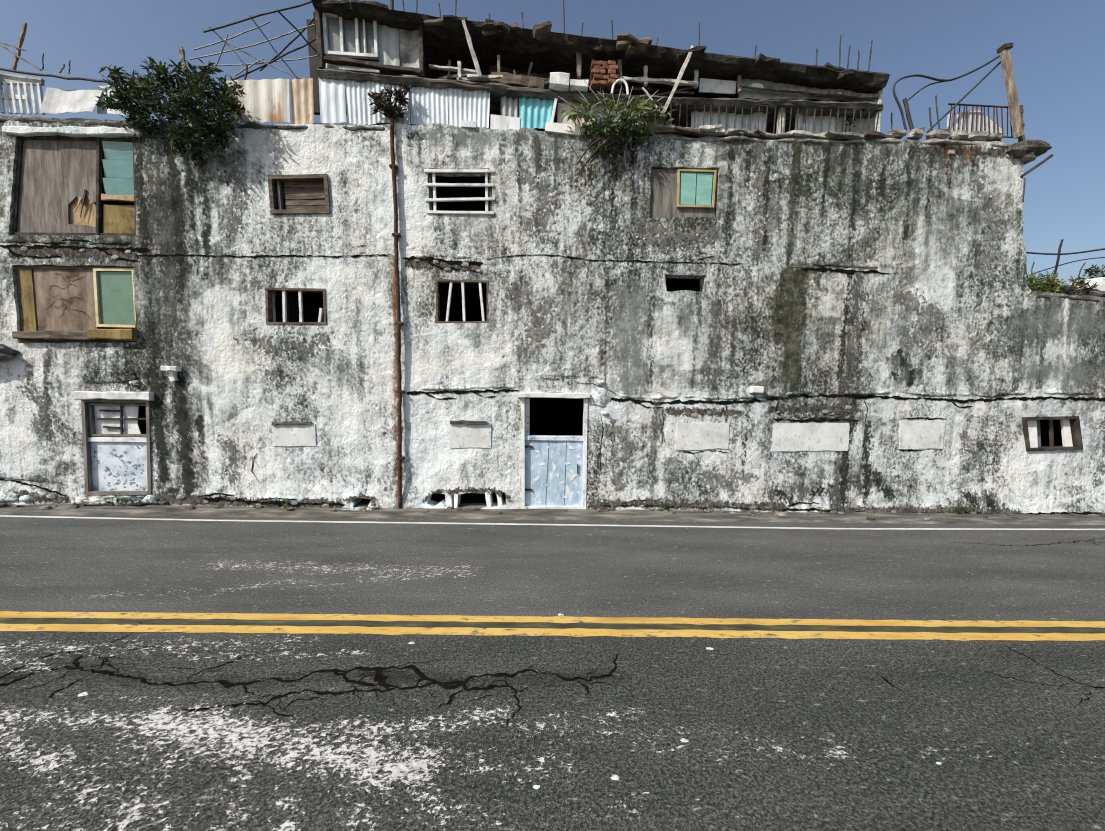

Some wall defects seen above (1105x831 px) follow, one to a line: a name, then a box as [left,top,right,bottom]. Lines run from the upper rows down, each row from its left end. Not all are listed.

leakage [133,120,229,498]
crack [0,239,742,277]
corrosion [390,256,403,500]
crack [403,389,519,400]
leakage [416,126,658,407]
leakage [647,400,666,485]
leakage [691,298,737,400]
crack [585,383,1105,477]
leakage [722,139,996,512]
crack [592,500,869,513]
mould [947,488,1009,514]
crack [1020,509,1102,517]